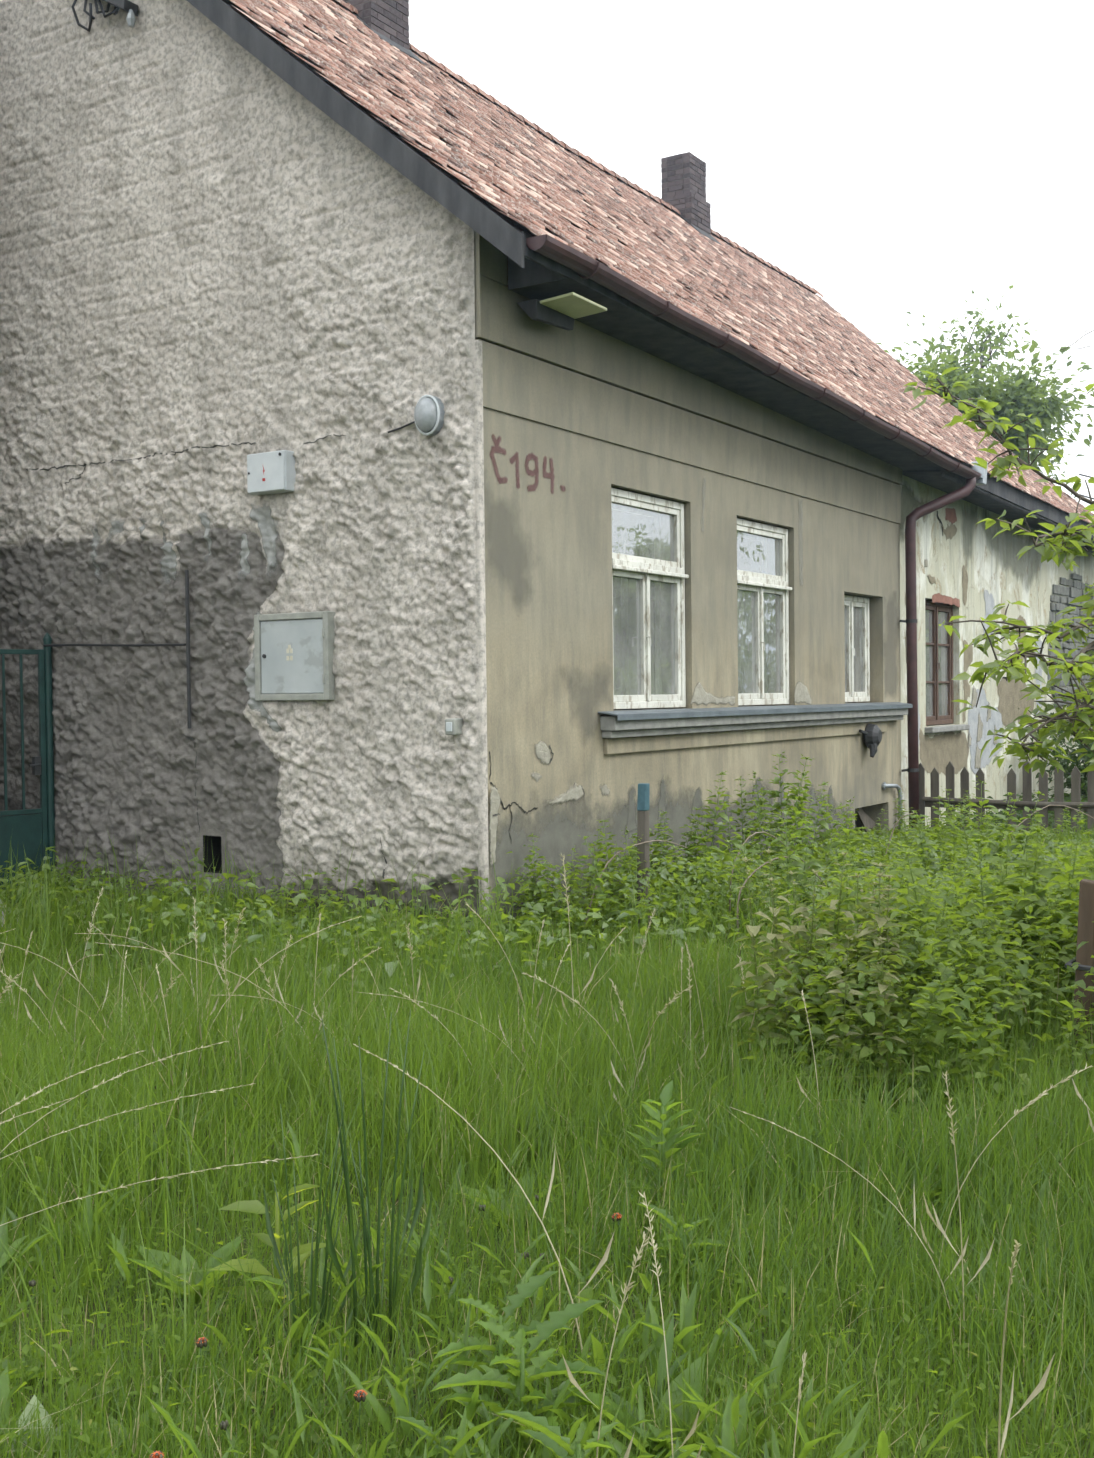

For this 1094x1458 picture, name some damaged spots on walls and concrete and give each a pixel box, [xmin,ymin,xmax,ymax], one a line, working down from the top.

crack [25,442,255,484]
flaking render [549,783,610,805]